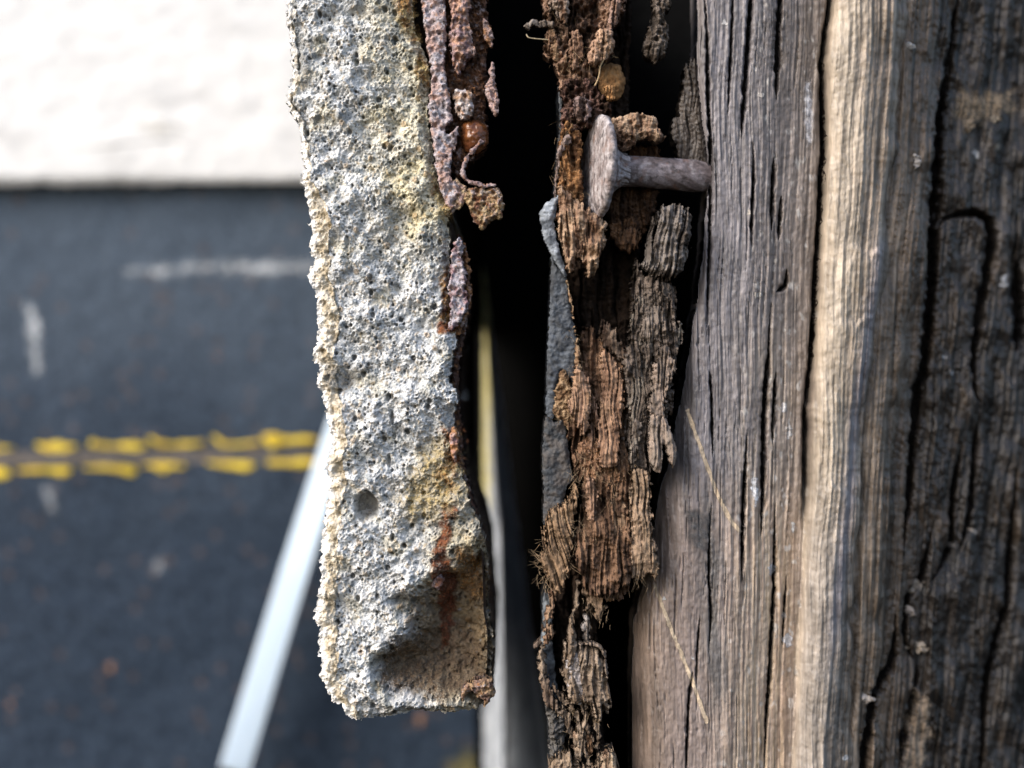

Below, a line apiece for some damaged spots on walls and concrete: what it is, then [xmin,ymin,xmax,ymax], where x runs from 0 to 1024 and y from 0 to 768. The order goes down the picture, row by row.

rust [399,426,486,648]
rust [437,237,473,336]
rust [431,173,505,231]
rust [448,0,500,121]
peeling [545,0,627,213]
peeling [567,278,684,642]
peeling [606,187,660,255]
crack [707,375,715,457]
crack [740,316,787,760]
crack [802,0,828,499]
crack [859,0,1024,768]
peeling [537,583,565,719]